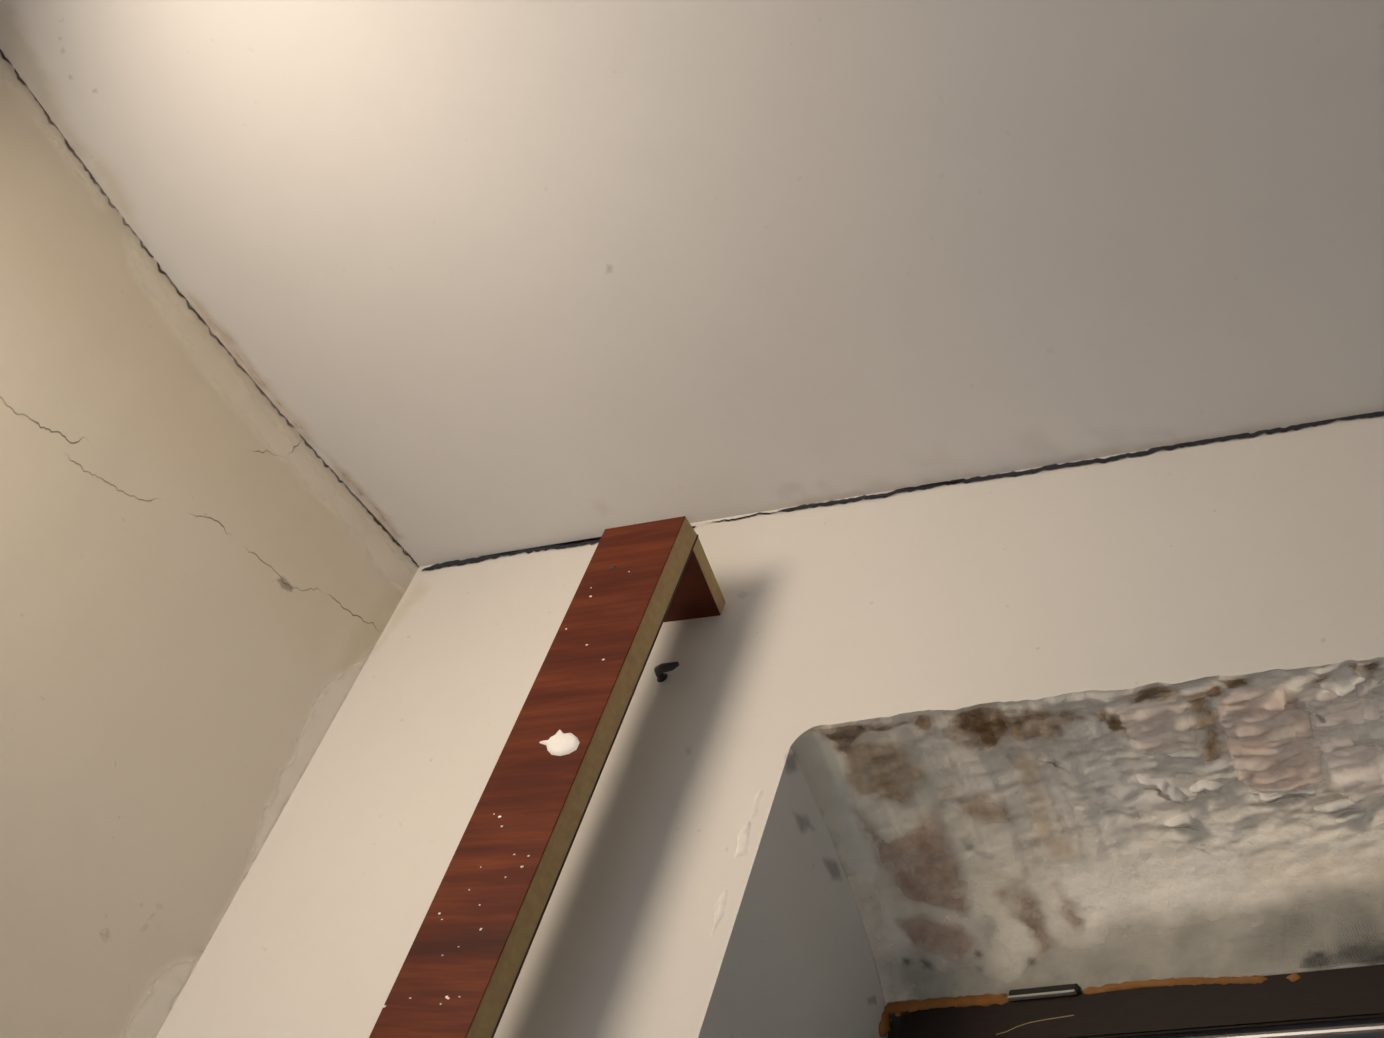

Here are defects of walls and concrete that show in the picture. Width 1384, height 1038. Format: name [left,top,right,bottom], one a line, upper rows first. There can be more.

crack [692,411,1384,528]
spalling [820,716,931,802]
spalling [952,708,1127,749]
spalling [1132,688,1178,703]
spalling [878,819,971,959]
spalling [1016,897,1048,952]
water stain [904,892,1384,1001]